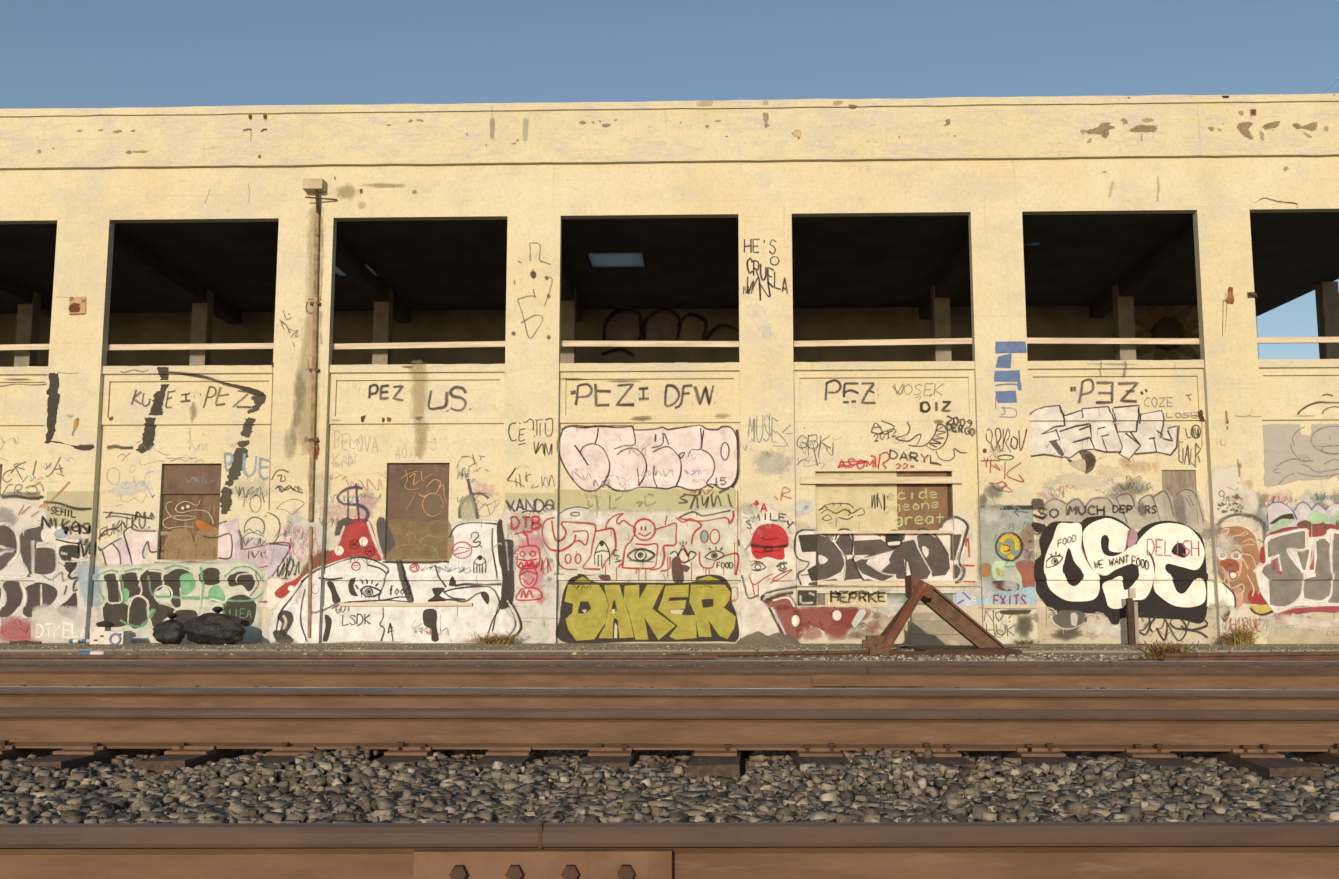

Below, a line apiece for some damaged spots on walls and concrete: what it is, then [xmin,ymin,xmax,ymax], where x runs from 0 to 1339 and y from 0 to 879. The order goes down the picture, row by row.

spalling [1080,118,1158,143]
spalling [1208,121,1328,141]